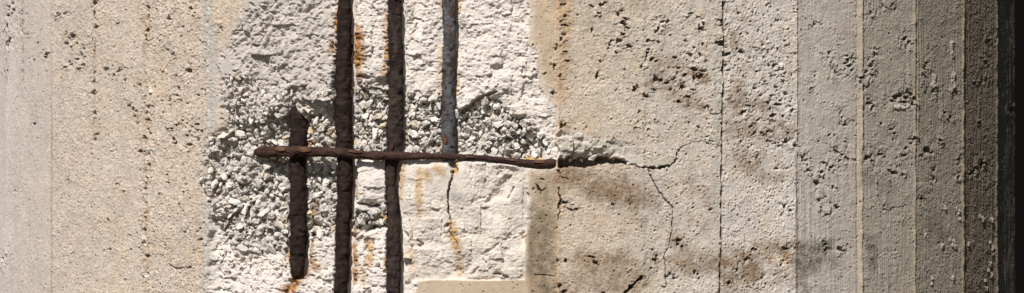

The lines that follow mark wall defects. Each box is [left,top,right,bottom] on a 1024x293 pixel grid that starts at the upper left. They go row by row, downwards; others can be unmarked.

rust [353,23,364,78]
rust [384,2,401,74]
rust [274,141,314,163]
spalling [62,0,659,293]
rust [416,155,475,217]
crack [447,170,459,248]
crack [623,0,726,293]
rust [283,205,320,293]
rust [352,228,387,283]